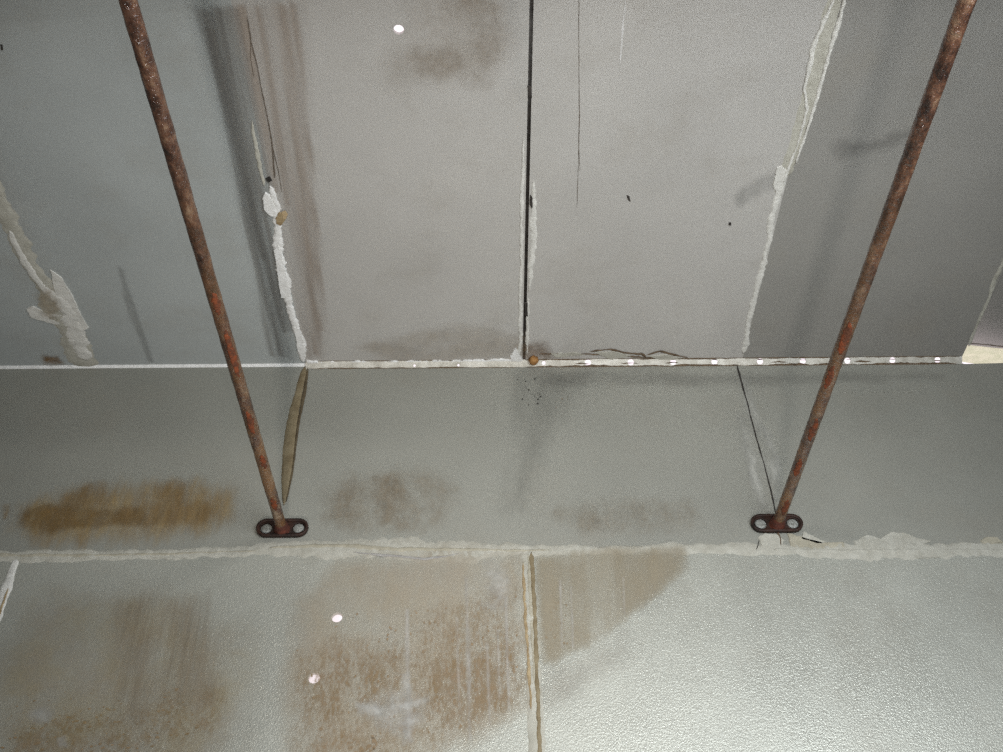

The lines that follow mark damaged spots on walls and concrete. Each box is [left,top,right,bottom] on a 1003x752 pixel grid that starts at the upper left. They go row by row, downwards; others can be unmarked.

spalling [275,210,288,226]
leakage [305,595,518,752]